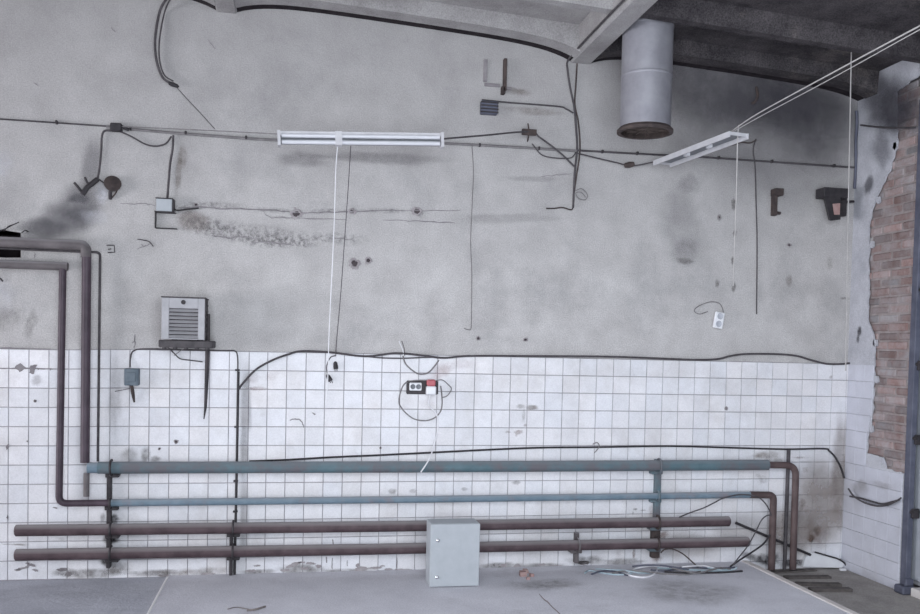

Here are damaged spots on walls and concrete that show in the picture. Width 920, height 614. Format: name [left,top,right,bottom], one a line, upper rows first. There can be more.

spalling [0,224,28,238]
spalling [0,249,28,261]
spalling [868,80,920,473]